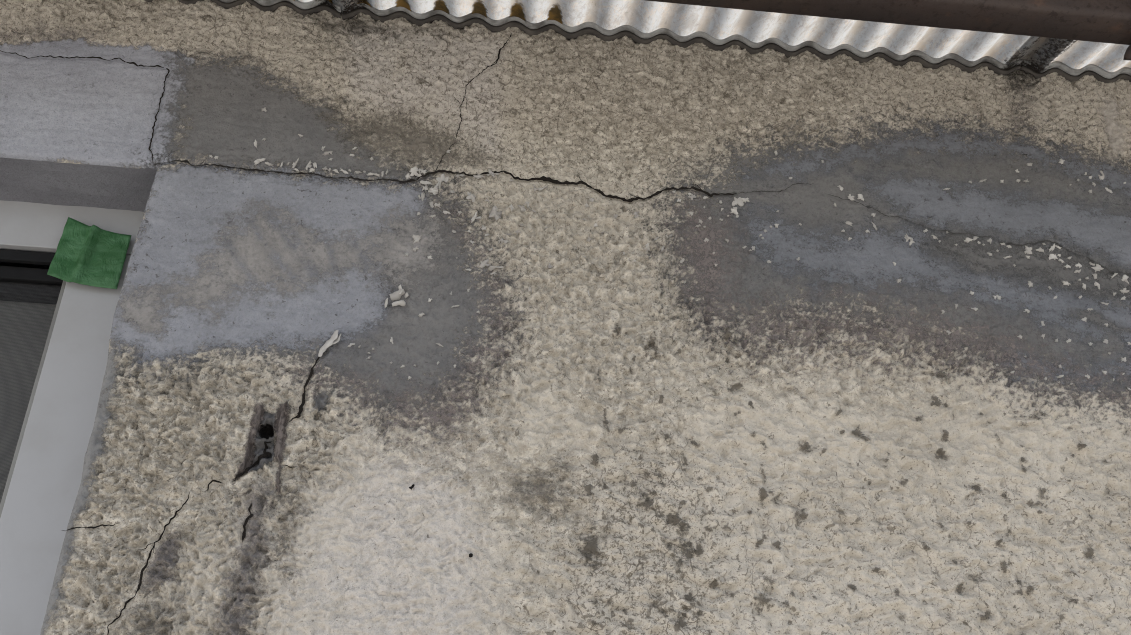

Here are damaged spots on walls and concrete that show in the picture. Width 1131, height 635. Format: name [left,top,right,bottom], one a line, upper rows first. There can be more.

damp [322,106,509,180]
crack [0,35,1131,275]
crack [289,352,324,422]
damp [277,263,522,447]
damp [656,191,1131,440]
hole [232,402,297,497]
damp [935,430,949,460]
crack [62,523,118,531]
crack [107,480,222,635]
crack [242,504,254,543]
damp [993,488,1048,608]